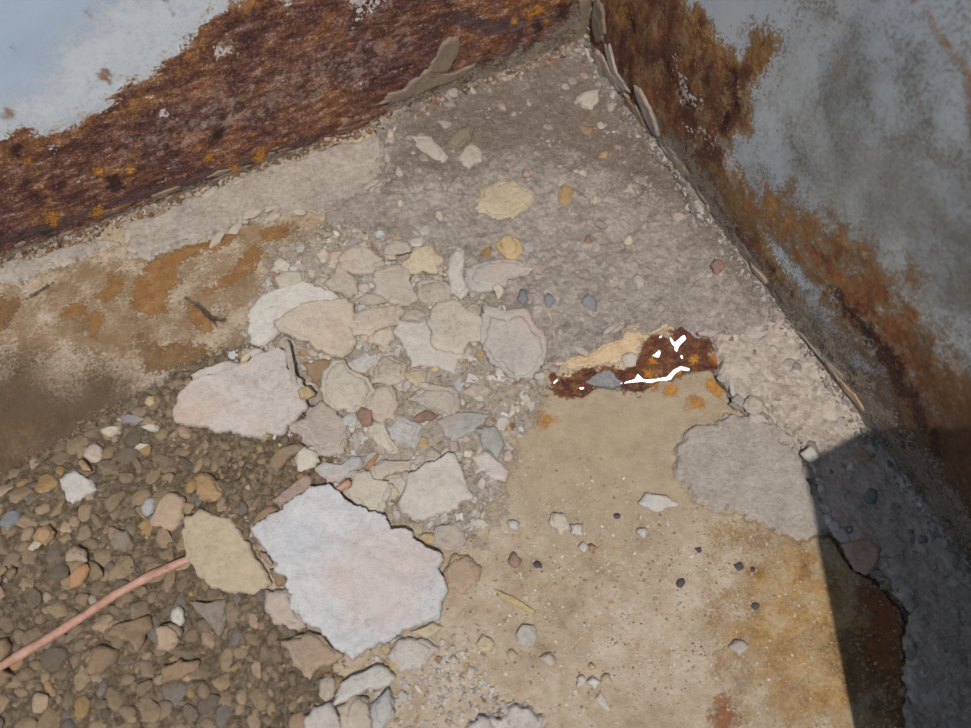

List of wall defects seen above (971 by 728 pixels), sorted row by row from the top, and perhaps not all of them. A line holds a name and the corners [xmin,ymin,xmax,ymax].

rust [0,0,578,728]
rust [576,89,599,110]
rust [585,0,971,560]
rust [696,518,911,728]